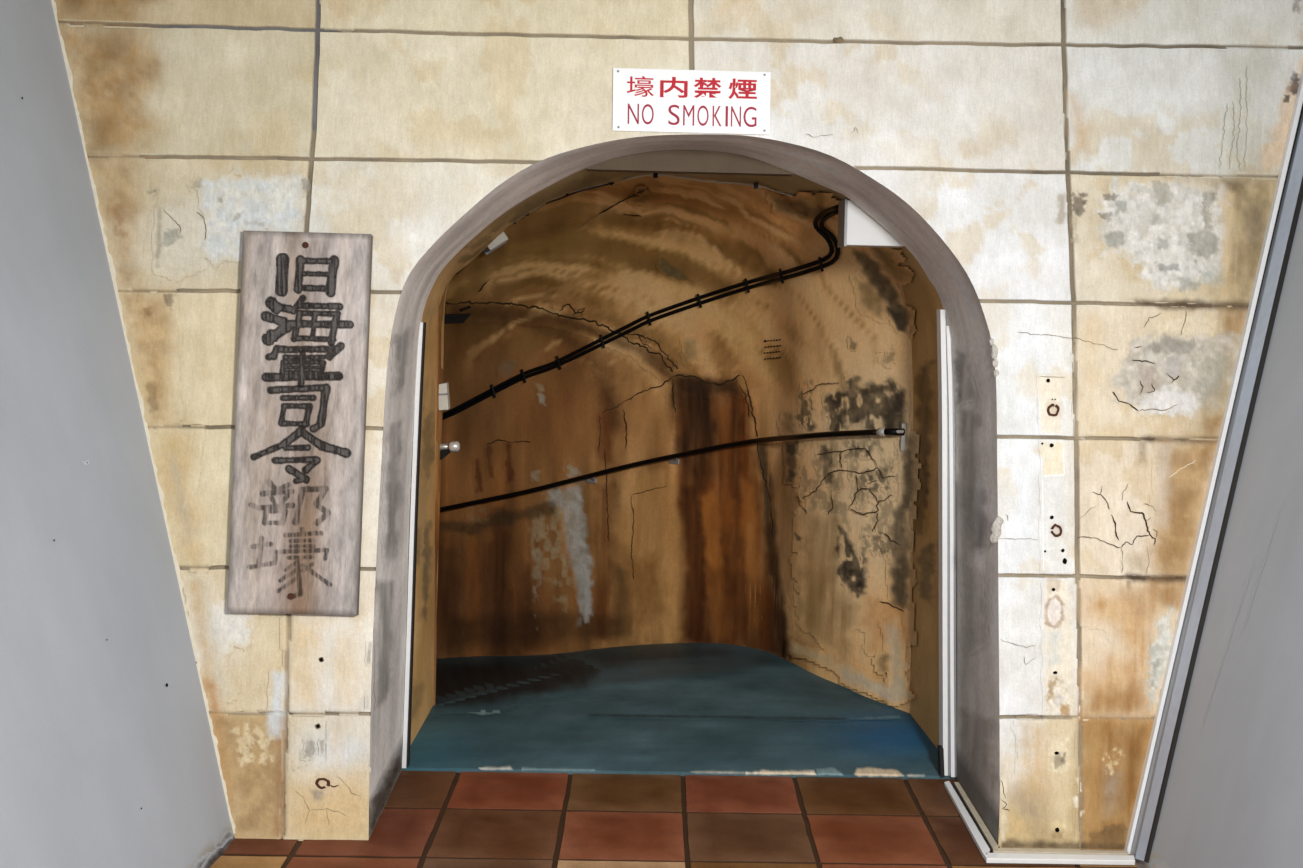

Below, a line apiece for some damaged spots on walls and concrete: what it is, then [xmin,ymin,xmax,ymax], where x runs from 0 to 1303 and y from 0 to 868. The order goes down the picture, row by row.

leakage [319,0,357,33]
leakage [455,171,613,268]
peeling [1090,174,1221,296]
leakage [54,0,213,574]
leakage [390,324,415,399]
crack [445,280,758,437]
peeling [1108,314,1223,421]
leakage [420,406,438,481]
leakage [416,463,748,672]
crack [797,448,900,545]
crack [1078,483,1158,570]
leakage [411,678,426,724]